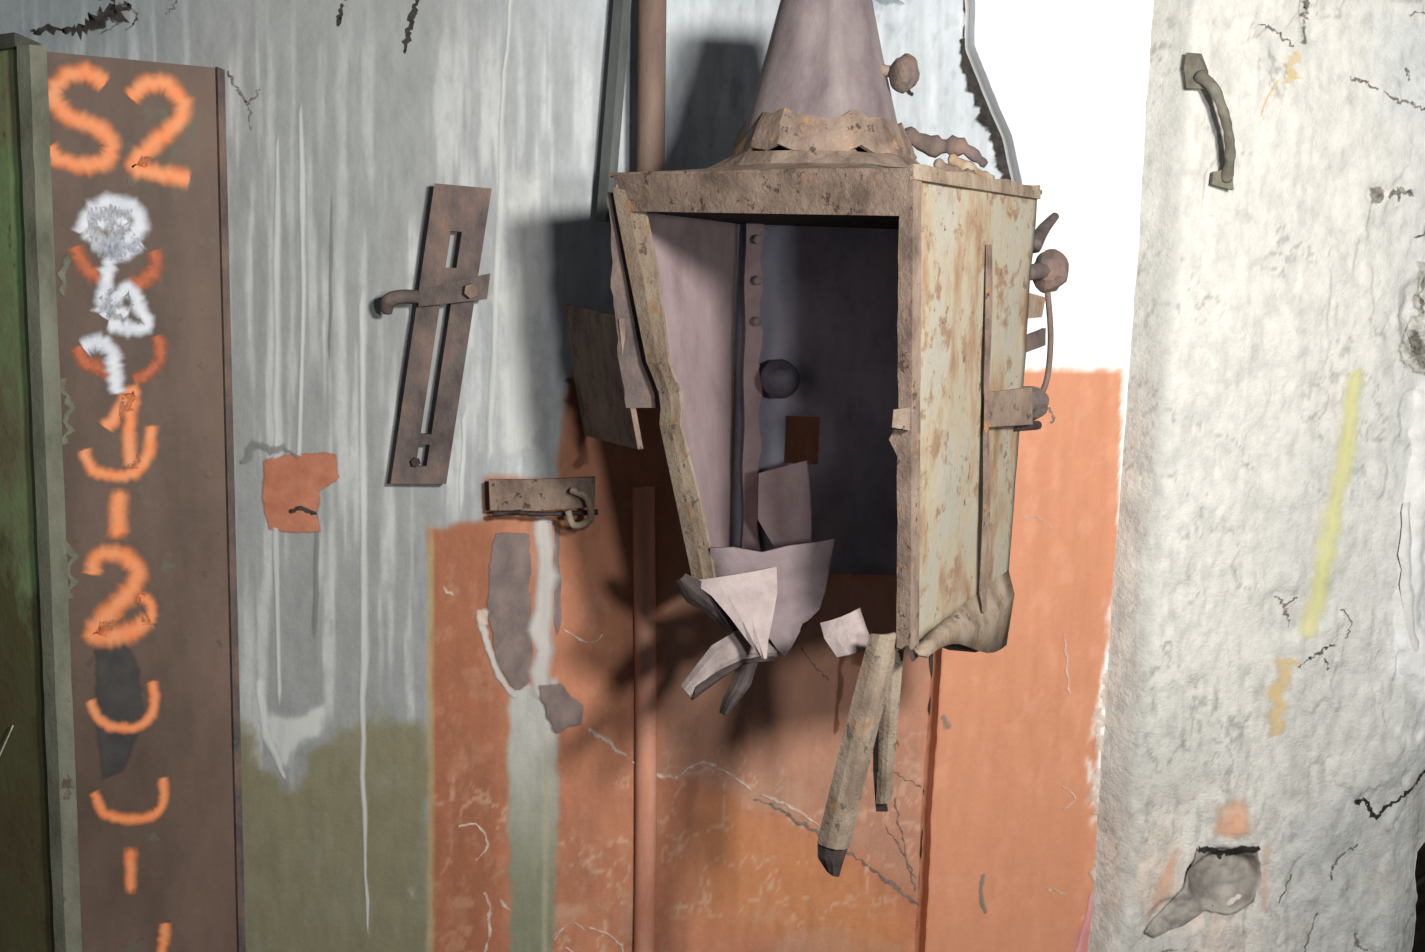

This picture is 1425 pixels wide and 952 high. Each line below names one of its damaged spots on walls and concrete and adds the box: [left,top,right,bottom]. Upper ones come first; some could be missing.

crack [31,0,178,39]
crack [960,0,1011,180]
spalling [1398,261,1425,373]
flaking render [241,442,339,533]
peeling [477,518,583,733]
crack [926,653,934,716]
crack [754,752,925,941]
spalling [1145,802,1267,952]
crack [1330,770,1425,880]